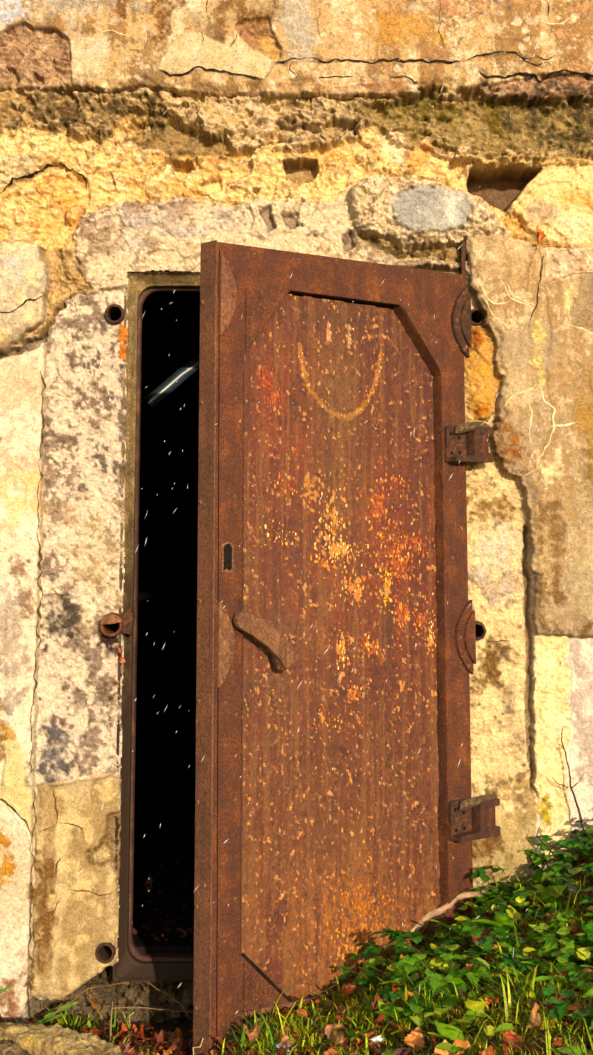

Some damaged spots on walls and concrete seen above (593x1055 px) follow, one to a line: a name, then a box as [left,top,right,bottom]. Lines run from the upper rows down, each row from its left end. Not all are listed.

crack [159,0,593,84]
spalling [0,18,593,251]
corrosion [464,325,526,470]
crack [504,384,577,476]
corrosion [310,461,439,658]
peeling [464,168,593,889]
leakage [0,555,80,761]
spalling [0,248,194,1026]
corrosion [324,629,394,669]
leakage [36,723,69,783]
corrosion [278,680,379,789]
corrosion [290,862,412,976]